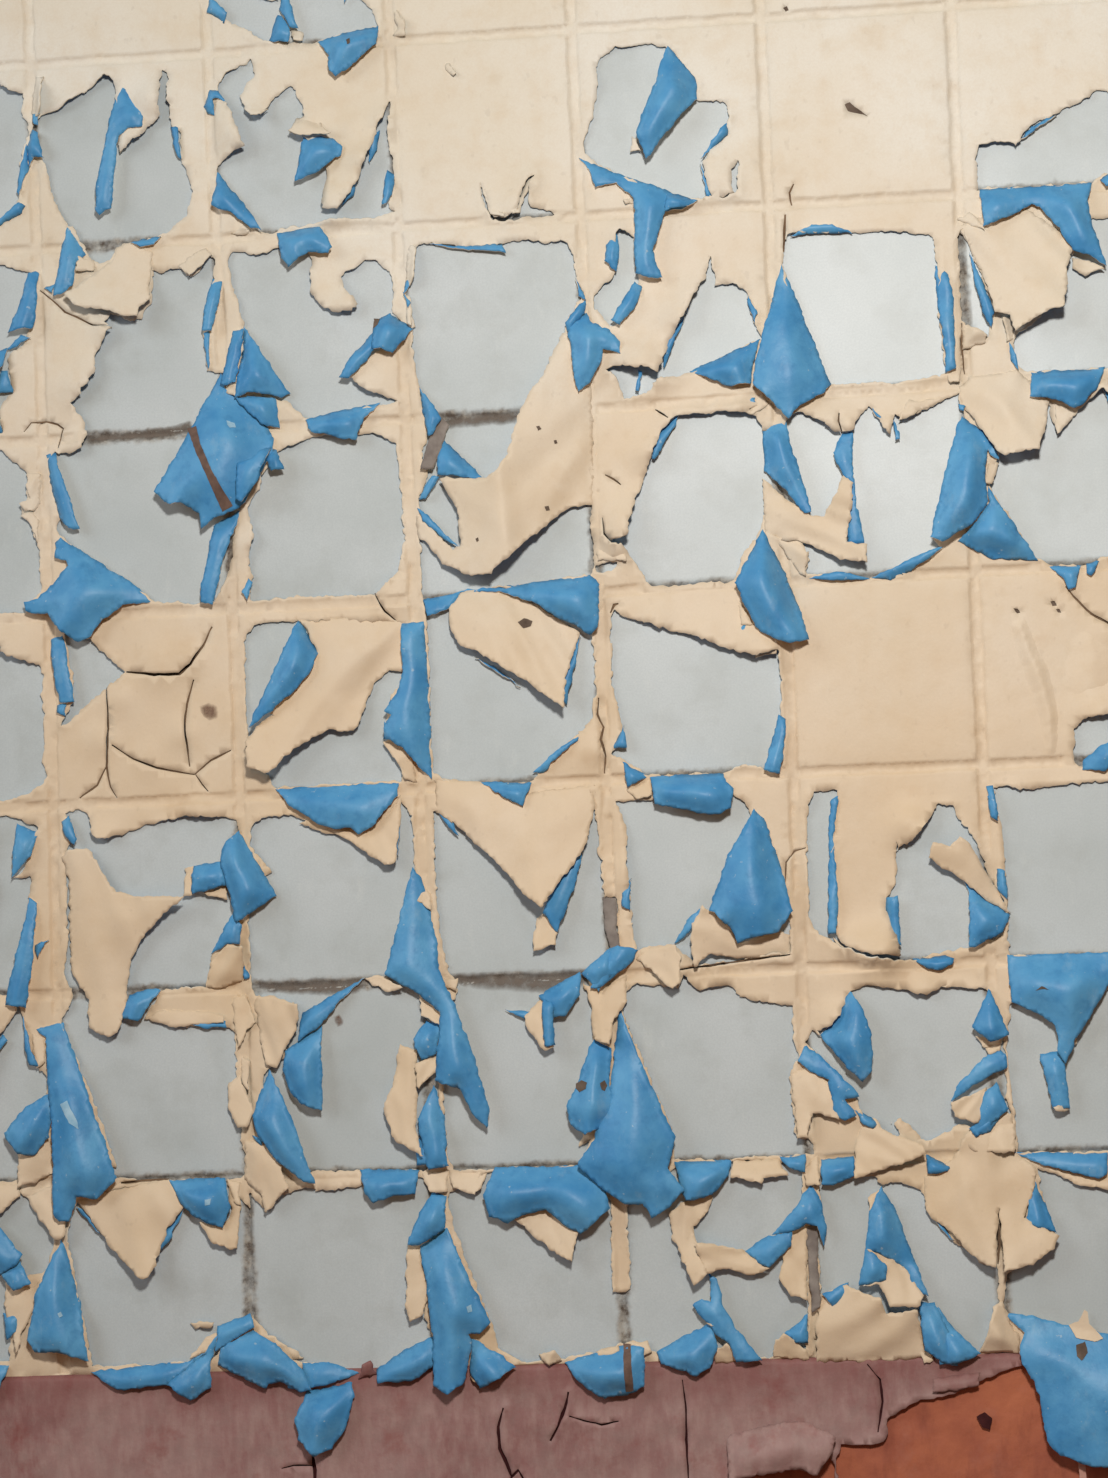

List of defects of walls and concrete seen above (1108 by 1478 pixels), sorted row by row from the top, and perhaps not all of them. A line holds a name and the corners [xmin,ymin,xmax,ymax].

peeling [207,0,406,77]
peeling [579,44,729,326]
peeling [603,90,1108,645]
crack [1066,586,1108,624]
crack [80,627,231,798]
peeling [0,59,620,1457]
peeling [249,610,1108,1478]
crack [497,1408,523,1478]
crack [550,1392,618,1441]